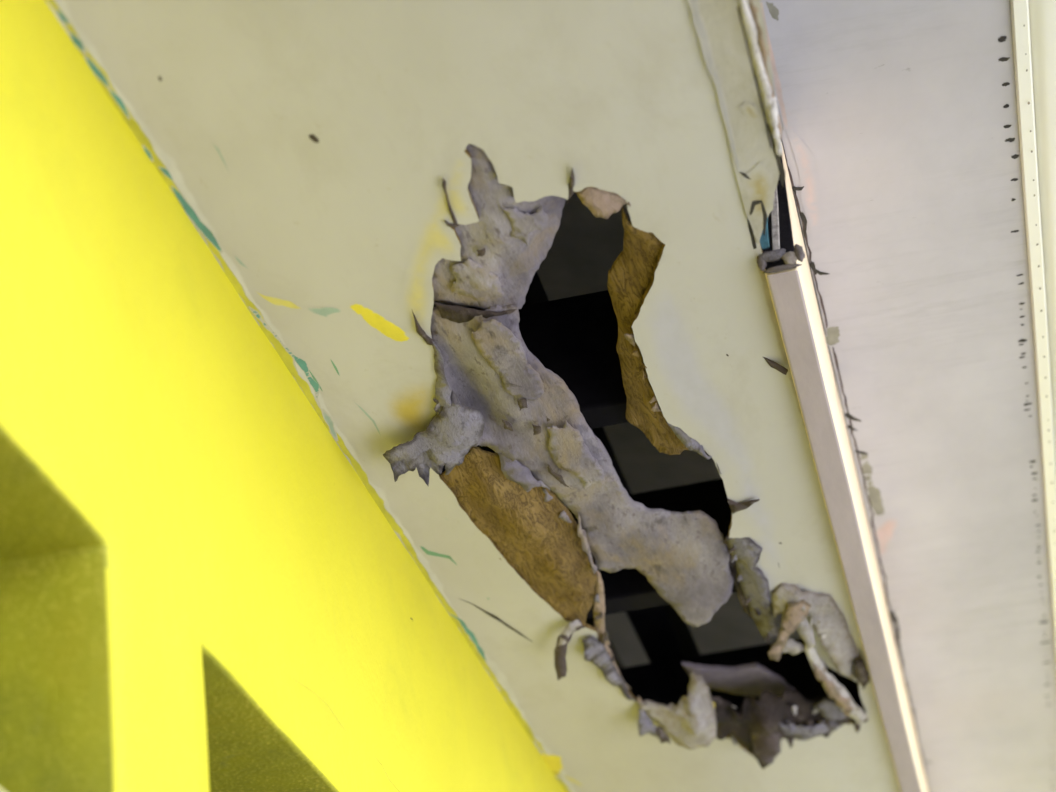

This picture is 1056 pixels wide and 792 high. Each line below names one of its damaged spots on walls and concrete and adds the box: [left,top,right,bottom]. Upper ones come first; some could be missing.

peeling [825,325,841,347]
spalling [547,464,572,489]
peeling [859,451,886,519]
peeling [637,708,671,744]
peeling [779,698,849,741]